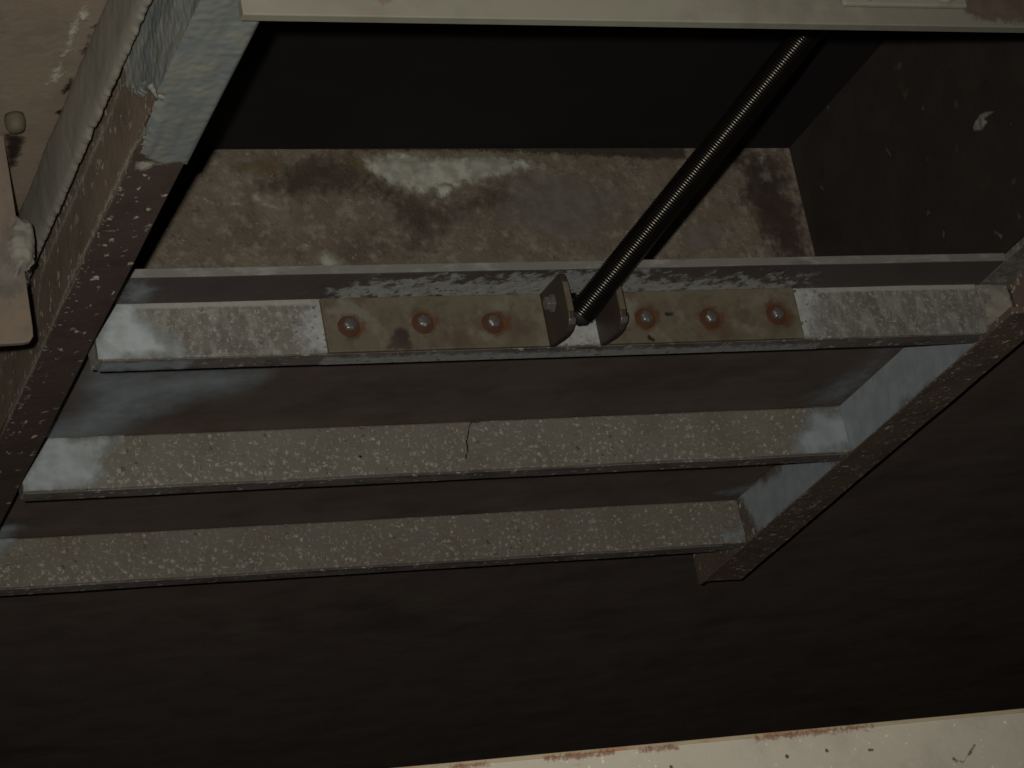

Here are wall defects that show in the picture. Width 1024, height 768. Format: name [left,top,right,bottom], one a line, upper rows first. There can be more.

leakage [8,92,168,419]
leakage [362,148,687,198]